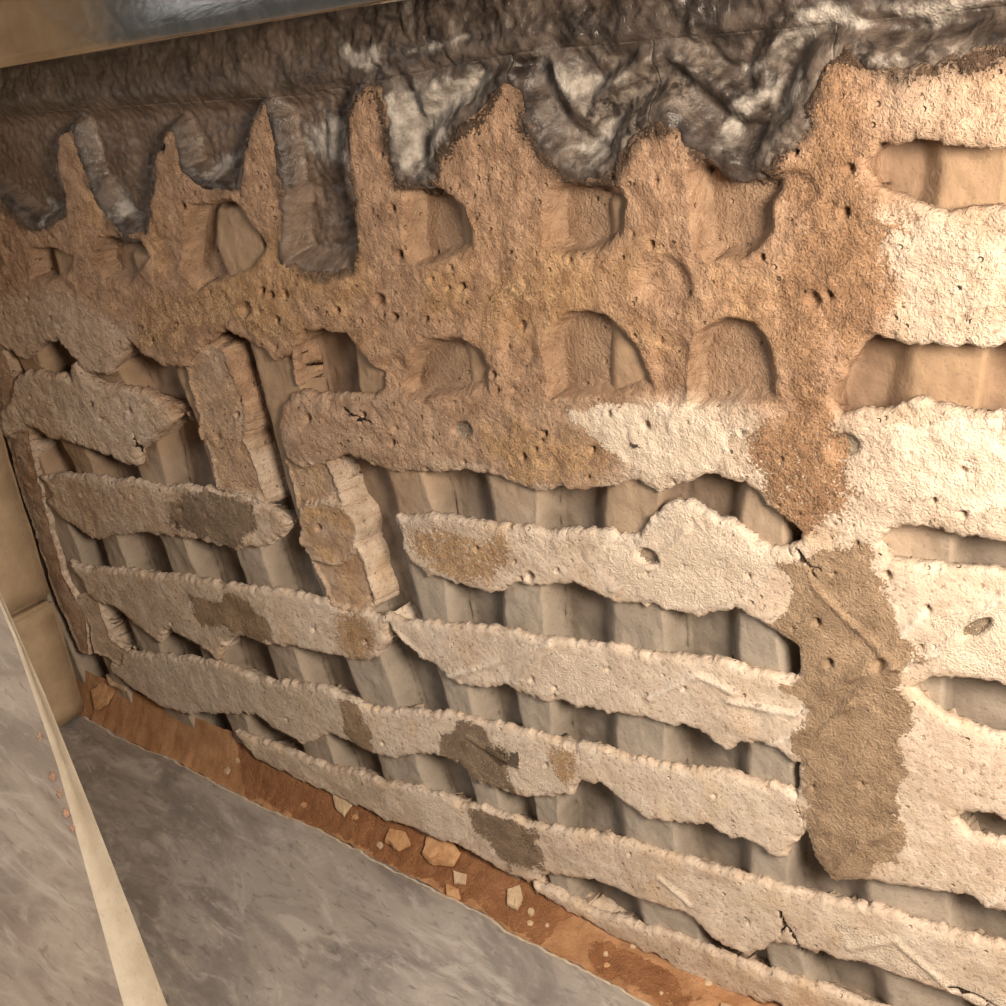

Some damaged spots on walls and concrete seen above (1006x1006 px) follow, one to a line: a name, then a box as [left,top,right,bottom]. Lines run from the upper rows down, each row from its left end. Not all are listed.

damp [0,0,1006,537]
spalling [566,398,756,486]
spalling [881,415,1006,514]
damp [169,485,258,549]
spalling [600,504,784,612]
damp [188,591,274,644]
spalling [932,606,1006,684]
damp [767,538,929,880]
damp [438,720,518,795]
spalling [463,739,567,794]
damp [468,808,545,872]
spalling [835,921,1006,1006]